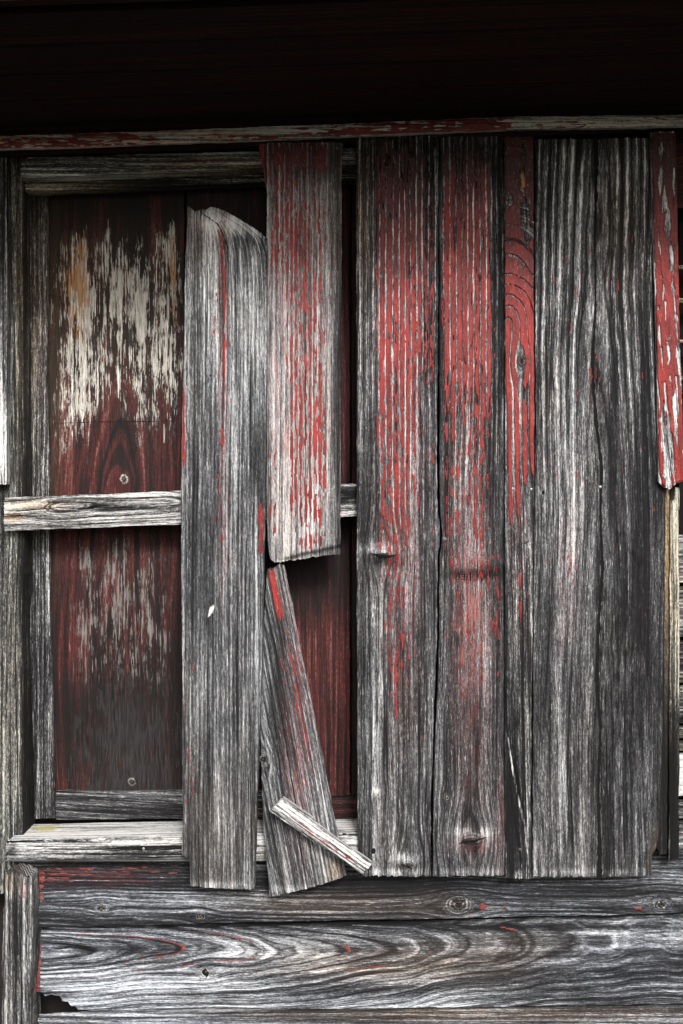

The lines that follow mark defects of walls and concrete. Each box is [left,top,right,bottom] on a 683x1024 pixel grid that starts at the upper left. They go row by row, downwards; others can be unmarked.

peeling [0,133,161,149]
peeling [51,219,185,467]
peeling [191,117,595,720]
peeling [651,116,683,488]
peeling [70,538,172,688]
peeling [281,646,313,787]